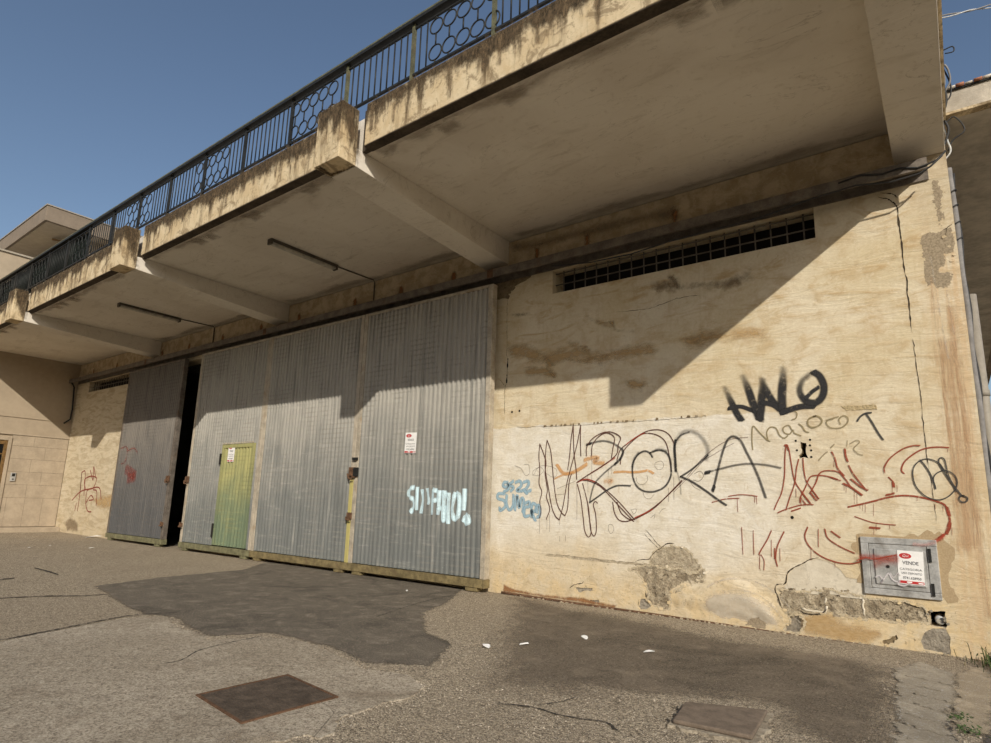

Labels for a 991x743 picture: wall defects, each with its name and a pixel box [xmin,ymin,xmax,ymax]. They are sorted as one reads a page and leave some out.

water stain [368,0,600,130]
water stain [0,102,359,316]
crack [879,193,936,513]
flaking render [545,544,706,611]
flaking render [776,586,950,646]